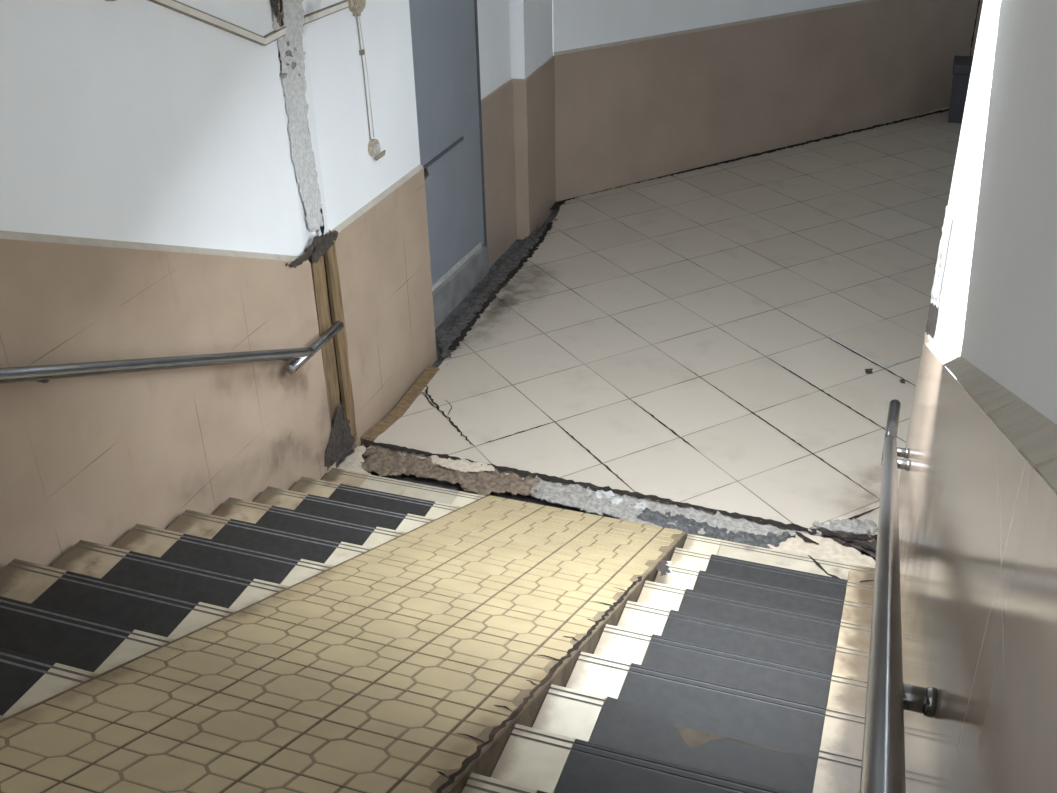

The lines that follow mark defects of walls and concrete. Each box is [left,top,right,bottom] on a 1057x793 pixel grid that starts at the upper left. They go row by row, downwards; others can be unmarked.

spalling [271,0,285,29]